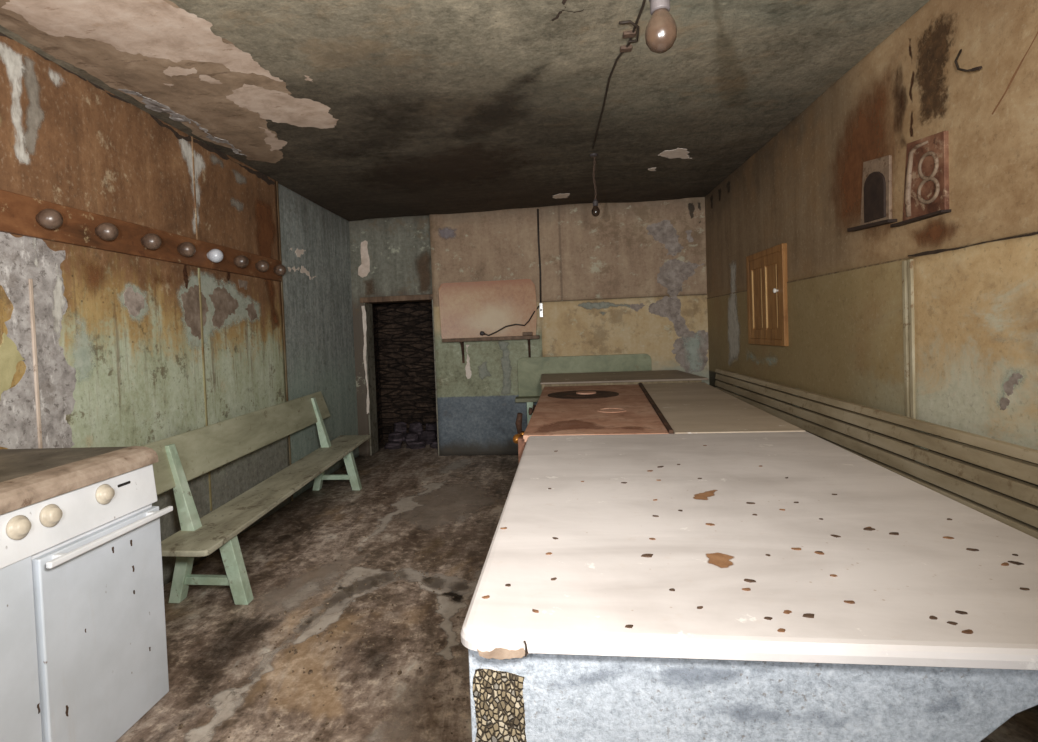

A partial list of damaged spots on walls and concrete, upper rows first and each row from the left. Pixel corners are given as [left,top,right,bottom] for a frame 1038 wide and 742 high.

leakage [0,43,44,164]
peeling [0,0,339,163]
leakage [179,139,223,232]
flaking render [648,148,690,171]
mould [909,15,954,137]
flaking render [0,232,91,449]
peeling [120,286,147,320]
peeling [179,275,259,346]
peeling [358,240,370,278]
peeling [578,220,709,373]